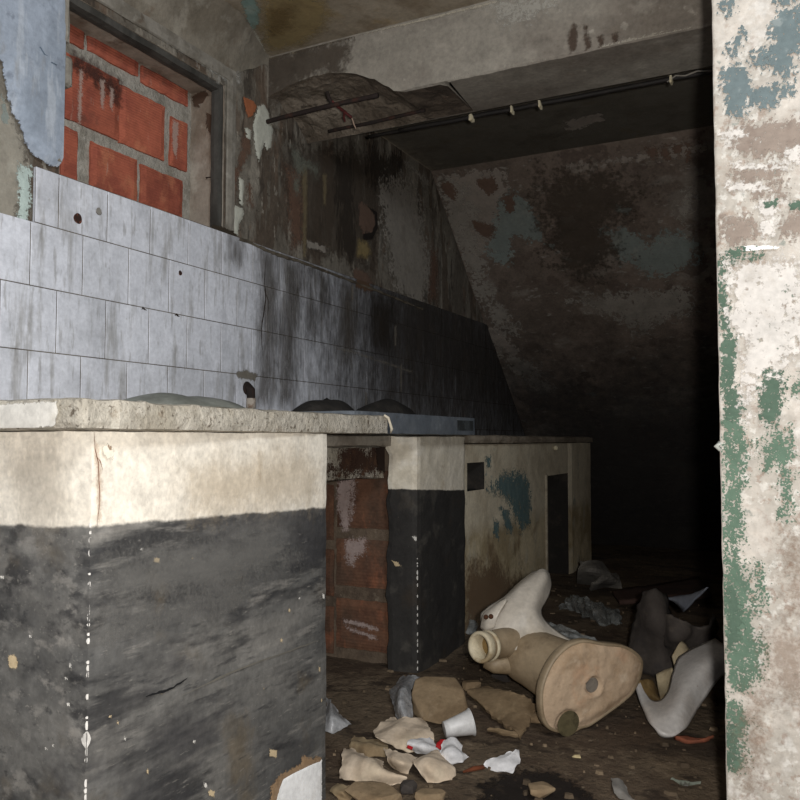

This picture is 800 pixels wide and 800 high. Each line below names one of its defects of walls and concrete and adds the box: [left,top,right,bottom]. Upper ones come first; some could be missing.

flaking render [0,0,73,220]
spalling [243,73,430,163]
water stain [282,139,524,339]
water stain [526,162,646,285]
water stain [284,266,299,397]
peeling [714,0,800,776]
crack [94,432,103,524]
peeling [485,463,532,543]
peeling [270,755,322,800]